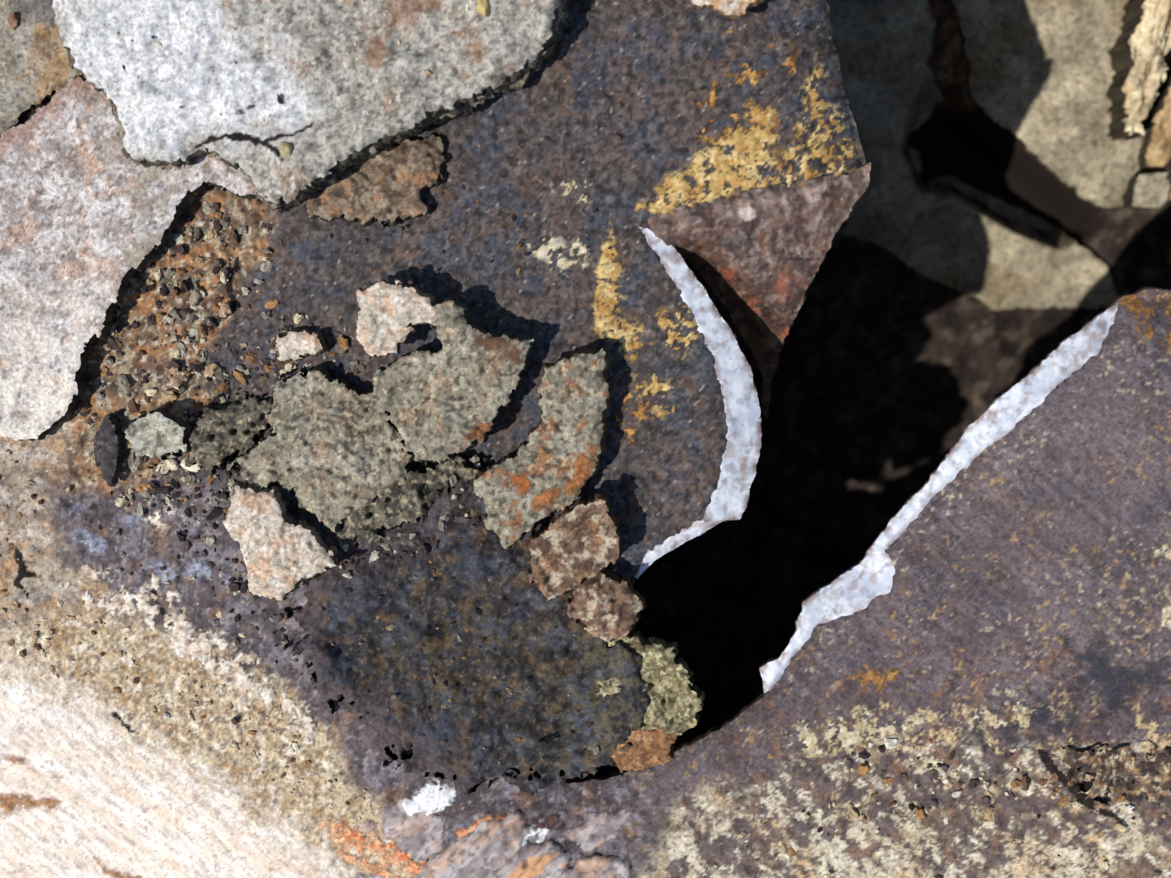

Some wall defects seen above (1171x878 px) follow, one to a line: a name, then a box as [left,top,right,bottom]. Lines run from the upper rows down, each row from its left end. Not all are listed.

crack [195,123,313,161]
peeling [0,0,574,231]
peeling [560,180,587,203]
corrosion [1119,291,1171,352]
peeling [222,222,705,773]
efflorescence [70,503,108,553]
efflorescence [145,559,233,585]
water stain [1072,641,1169,718]
water stain [969,696,1076,750]
corrosion [316,819,427,878]
corrosion [457,813,509,840]
corrosion [531,814,564,846]